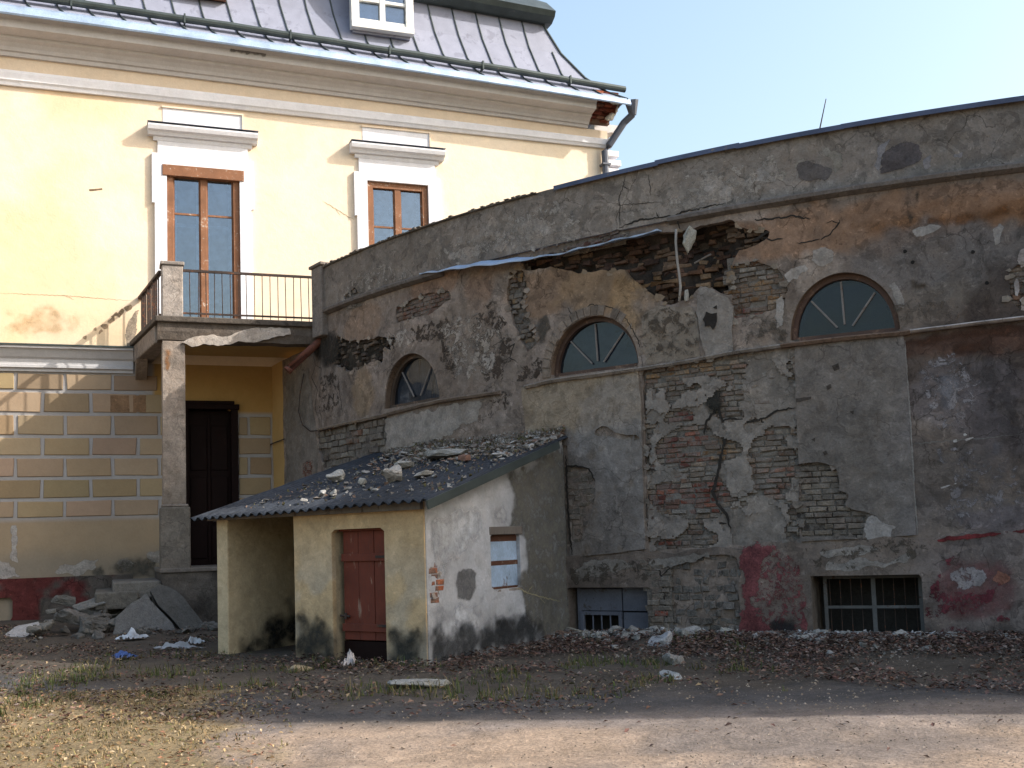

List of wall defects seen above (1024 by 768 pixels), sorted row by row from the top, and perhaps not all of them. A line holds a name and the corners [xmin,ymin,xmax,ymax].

flaking render [589,90,620,126]
crack [618,175,724,229]
crack [752,215,840,244]
flaking render [316,221,925,633]
crack [703,407,794,528]
leakage [432,449,570,663]
peeling [925,556,1010,632]
leakage [243,614,336,660]